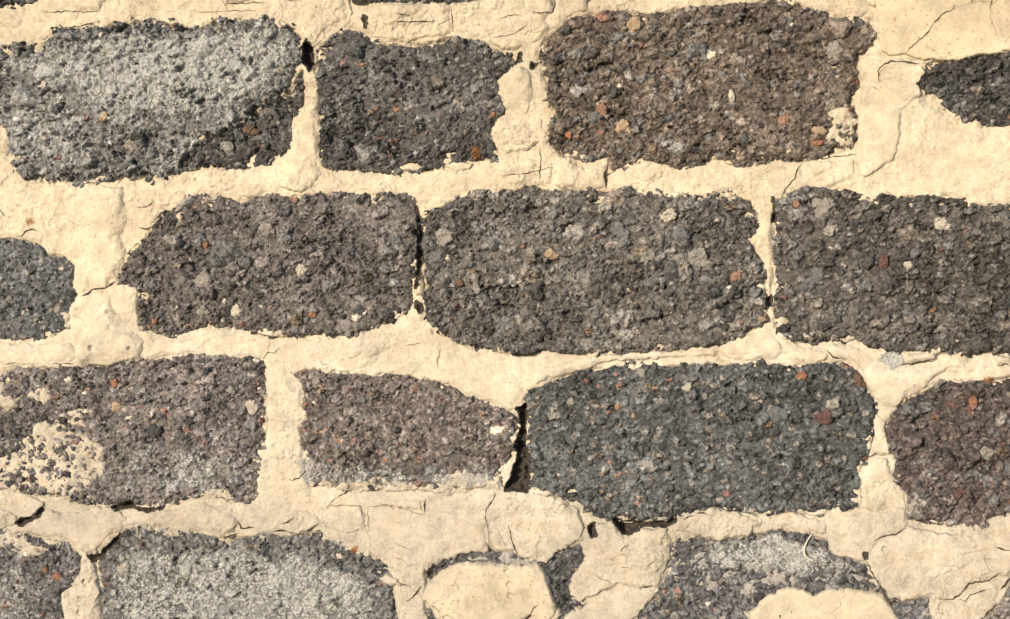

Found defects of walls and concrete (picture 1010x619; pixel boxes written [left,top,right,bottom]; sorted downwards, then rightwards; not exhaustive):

crack [877,0,1008,80]
peeling [783,40,1010,195]
crack [219,490,426,538]
crack [485,493,520,560]
crack [866,528,906,611]
crack [942,547,1010,618]